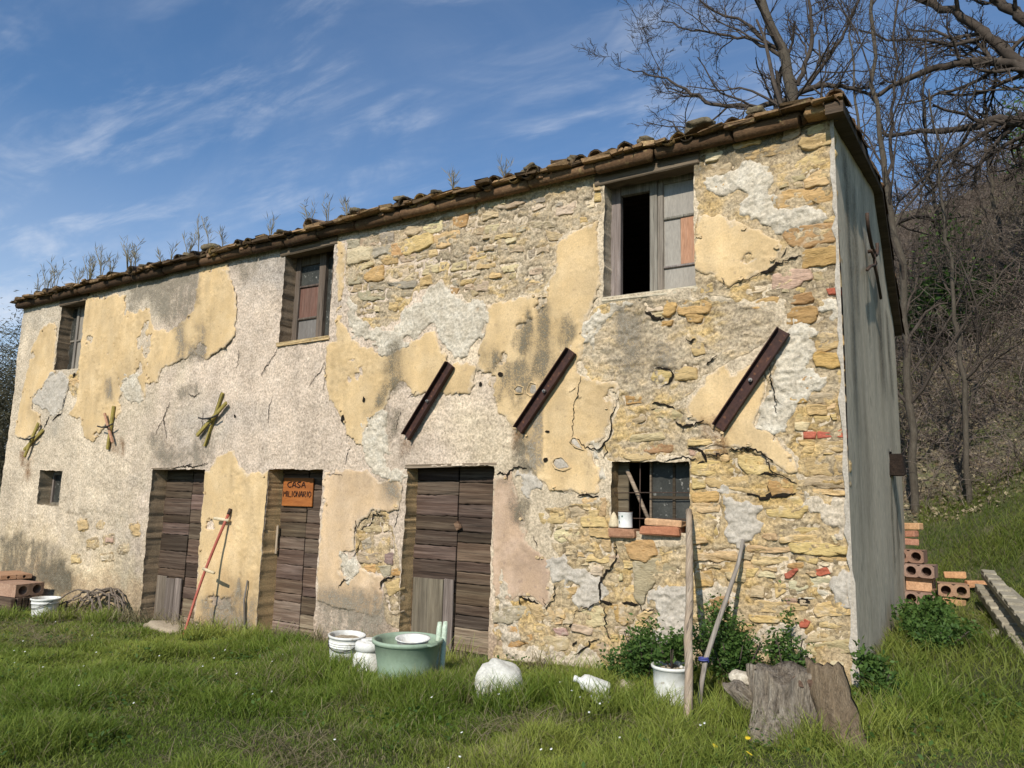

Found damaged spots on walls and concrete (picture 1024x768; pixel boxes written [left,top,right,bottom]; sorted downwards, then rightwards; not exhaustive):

flaking render [15,322,57,439]
damp [492,304,575,400]
flaking render [317,120,853,686]
crack [569,377,619,458]
crack [519,540,654,655]